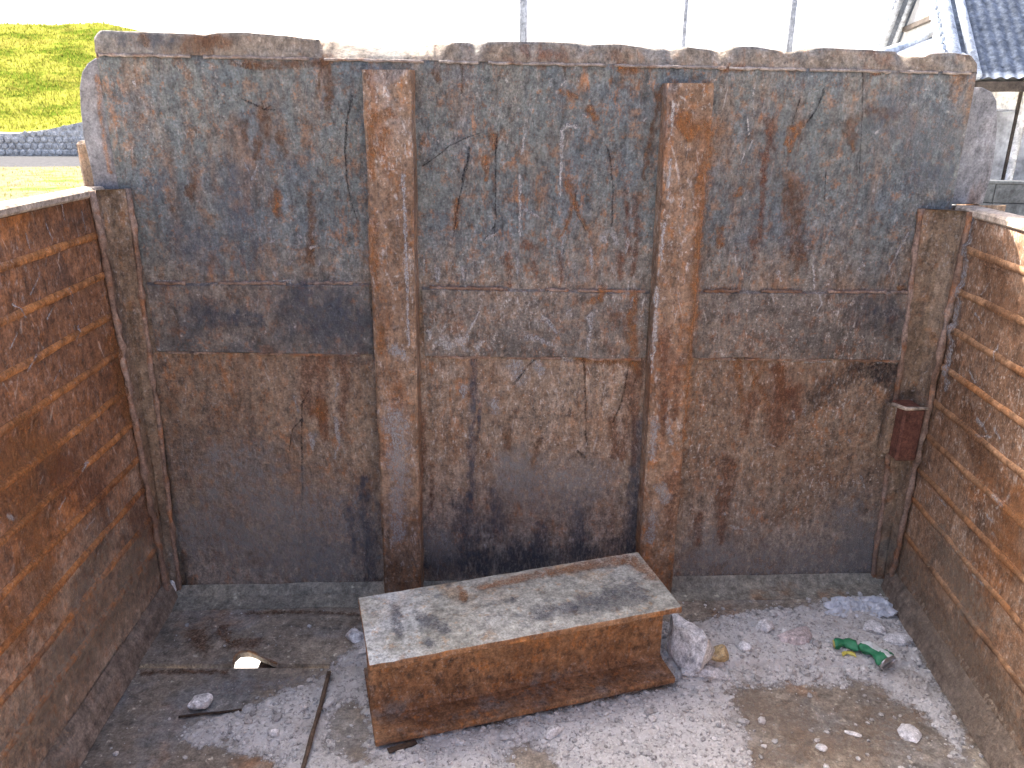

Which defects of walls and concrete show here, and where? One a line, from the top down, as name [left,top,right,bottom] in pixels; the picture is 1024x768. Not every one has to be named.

crack [344,95,357,218]
crack [423,133,498,241]
corrosion [750,119,804,250]
crack [790,88,825,129]
corrosion [658,111,724,442]
crack [289,390,309,543]
damp [423,311,674,577]
crack [577,364,588,458]
corrosion [734,359,896,448]